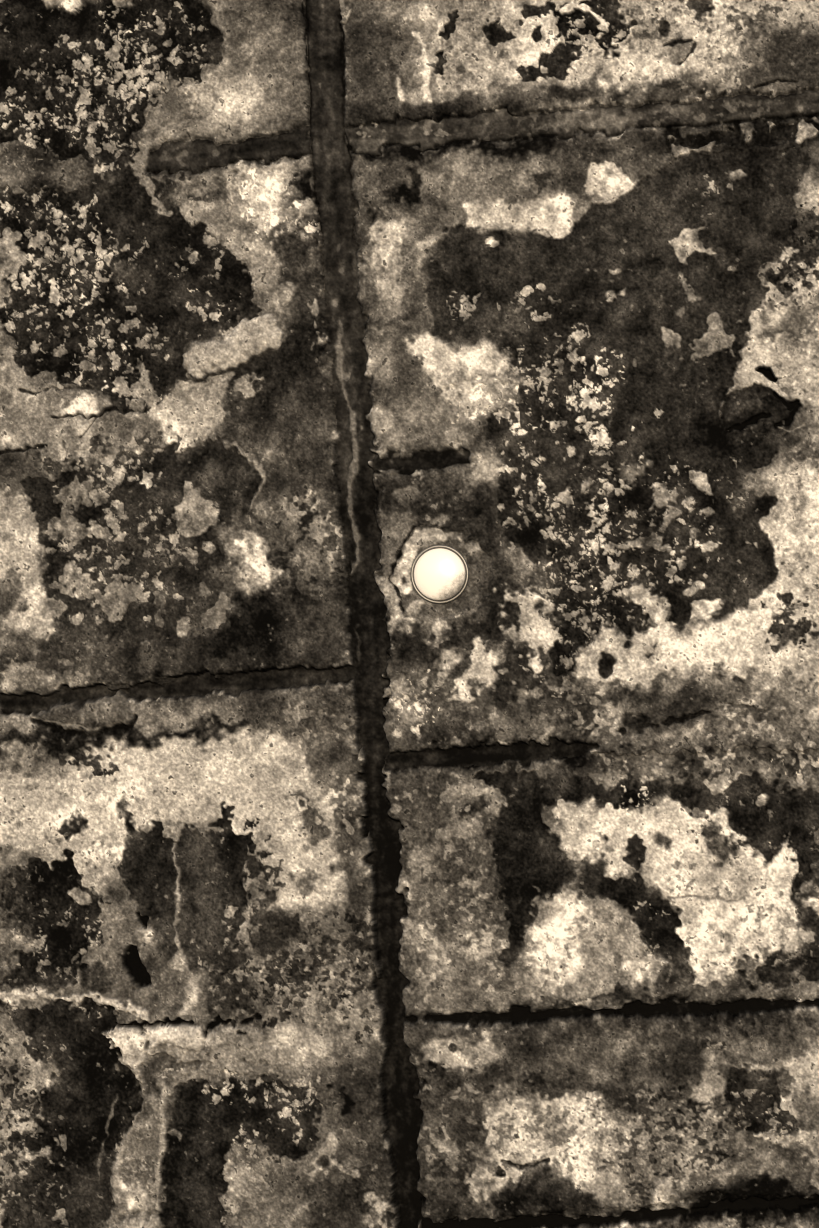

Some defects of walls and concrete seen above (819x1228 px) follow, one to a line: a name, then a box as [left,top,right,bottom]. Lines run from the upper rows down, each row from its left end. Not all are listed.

damp [462,193,575,239]
damp [584,161,635,199]
efflorescence [405,333,524,428]
peeling [423,114,819,698]
spalling [390,521,494,621]
damp [492,586,562,674]
damp [573,583,819,693]
damp [552,796,819,987]
damp [509,886,672,1007]
damp [0,987,150,1021]